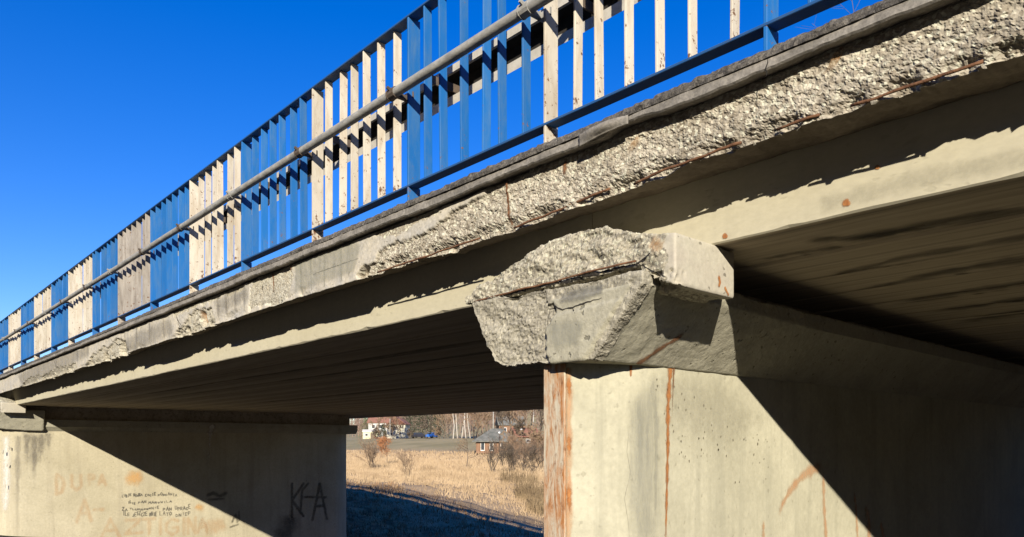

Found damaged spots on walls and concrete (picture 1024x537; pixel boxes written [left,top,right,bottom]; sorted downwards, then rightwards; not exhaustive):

spalling [357,0,1024,280]
spalling [174,266,294,338]
spalling [465,226,724,370]
spalling [24,338,130,386]
corrosion [629,334,682,376]
corrosion [665,368,675,525]
corrosion [782,465,827,537]